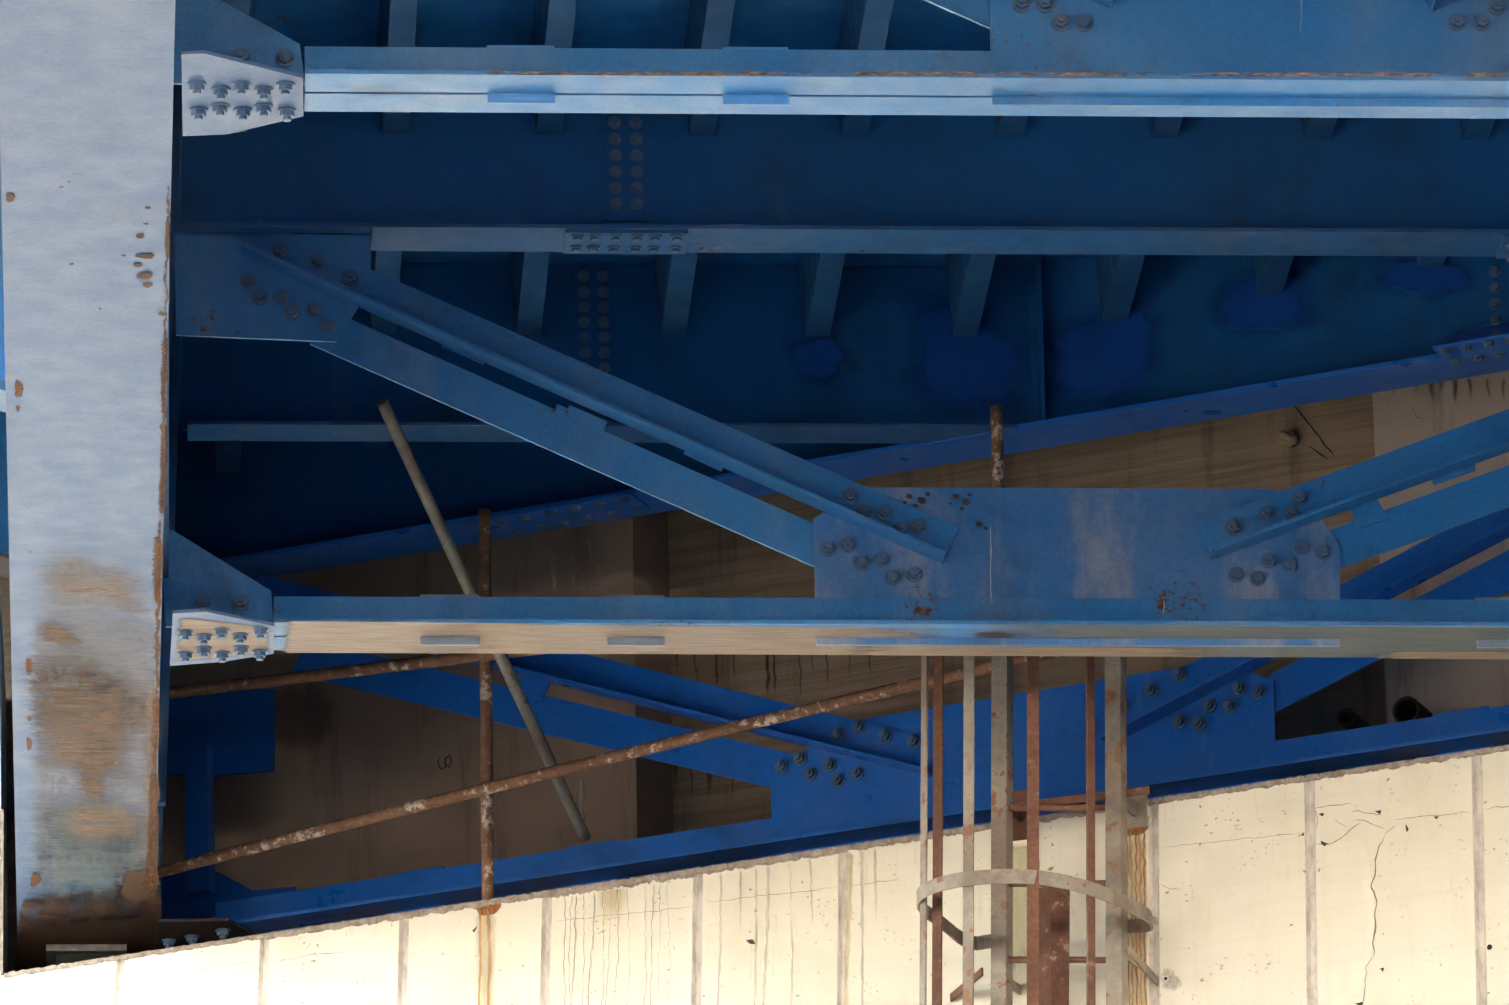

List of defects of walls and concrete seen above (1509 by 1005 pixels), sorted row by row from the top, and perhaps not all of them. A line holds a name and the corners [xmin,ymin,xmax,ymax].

corrosion [14,380,23,412]
corrosion [25,186,1203,898]
corrosion [1386,651,1509,660]
corrosion [476,903,501,1005]
water stain [563,884,671,1005]
crack [1170,803,1509,1002]